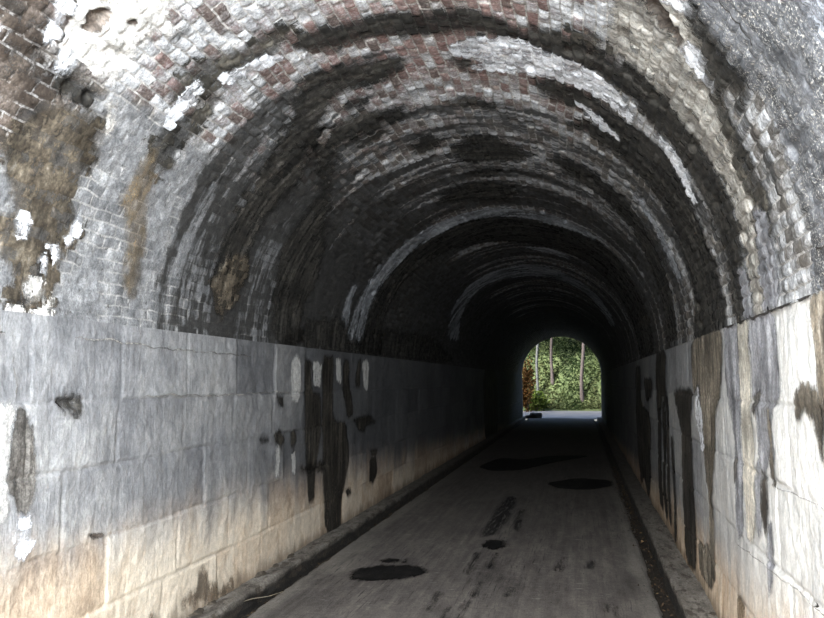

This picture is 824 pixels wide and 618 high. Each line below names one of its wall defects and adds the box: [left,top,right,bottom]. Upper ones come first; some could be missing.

spalling [81,8,114,33]
damp [801,0,824,43]
damp [218,54,283,85]
damp [408,134,445,155]
damp [447,35,634,123]
damp [575,101,620,141]
damp [0,101,117,316]
damp [602,0,780,589]
damp [793,291,824,464]
damp [0,402,36,562]
damp [259,355,375,533]
damp [369,449,377,483]